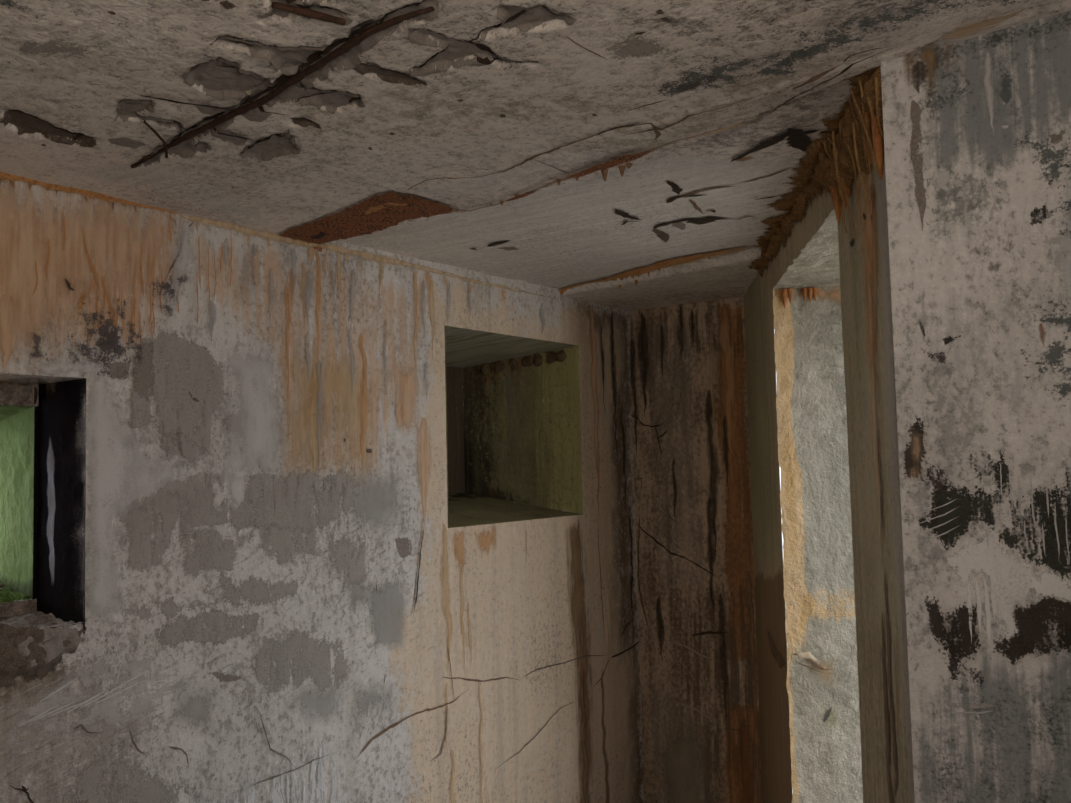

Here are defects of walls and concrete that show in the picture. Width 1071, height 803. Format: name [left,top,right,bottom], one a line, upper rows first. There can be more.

spalling [1,0,577,168]
corrosion [0,128,723,325]
corrosion [559,66,884,295]
damp [906,47,1013,231]
damp [1021,295,1071,406]
crack [11,786,34,803]
crack [130,731,189,767]
peeling [107,332,404,715]
corrosion [442,524,483,803]
crack [249,507,728,787]
damp [903,417,948,496]
peeling [918,450,1071,694]